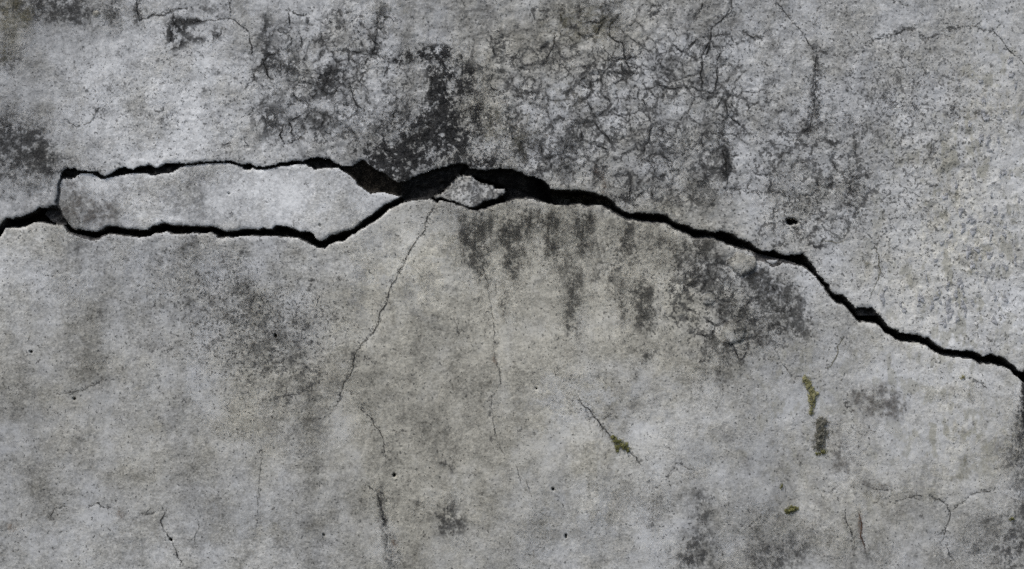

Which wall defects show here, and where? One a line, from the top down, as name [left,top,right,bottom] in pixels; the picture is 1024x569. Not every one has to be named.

leakage [261,19,296,75]
leakage [312,67,339,94]
leakage [260,108,279,133]
leakage [353,44,504,182]
crack [486,0,1024,388]
crack [0,1,507,452]
leakage [459,211,558,277]
leakage [574,215,594,256]
leakage [673,239,732,291]
leakage [566,273,581,330]
leakage [619,281,655,331]
leakage [719,272,811,340]